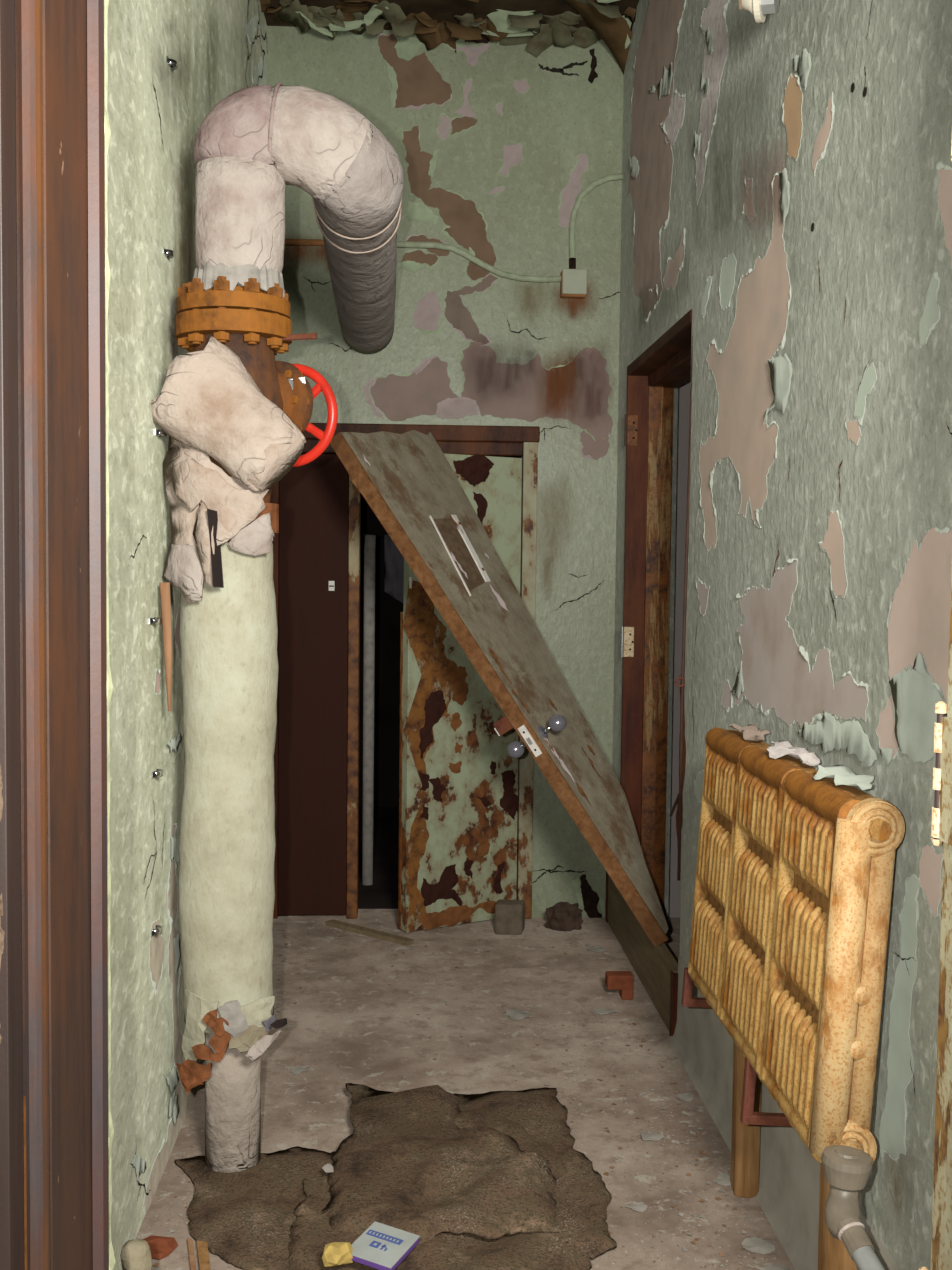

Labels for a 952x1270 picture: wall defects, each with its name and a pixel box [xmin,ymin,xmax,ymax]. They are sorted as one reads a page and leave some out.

crack [560,61,588,71]
peeling [243,0,730,461]
peeling [936,161,952,266]
peeling [699,49,835,552]
peeling [919,272,941,348]
peeling [845,362,877,446]
crack [554,573,605,611]
peeling [819,510,848,598]
peeling [722,527,952,767]
peeling [676,678,704,847]
peeling [879,844,943,1161]